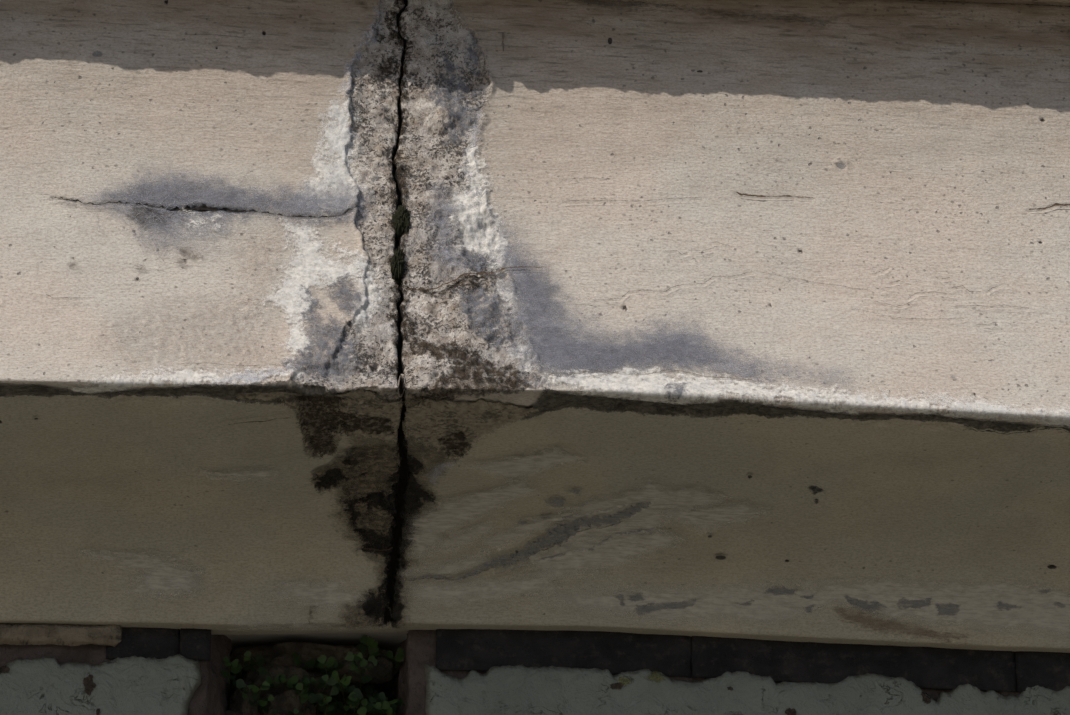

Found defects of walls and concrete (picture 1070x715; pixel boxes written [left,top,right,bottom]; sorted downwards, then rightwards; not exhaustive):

crack [24,0,423,253]
damp [73,98,381,394]
crack [364,266,651,625]
damp [339,438,681,630]